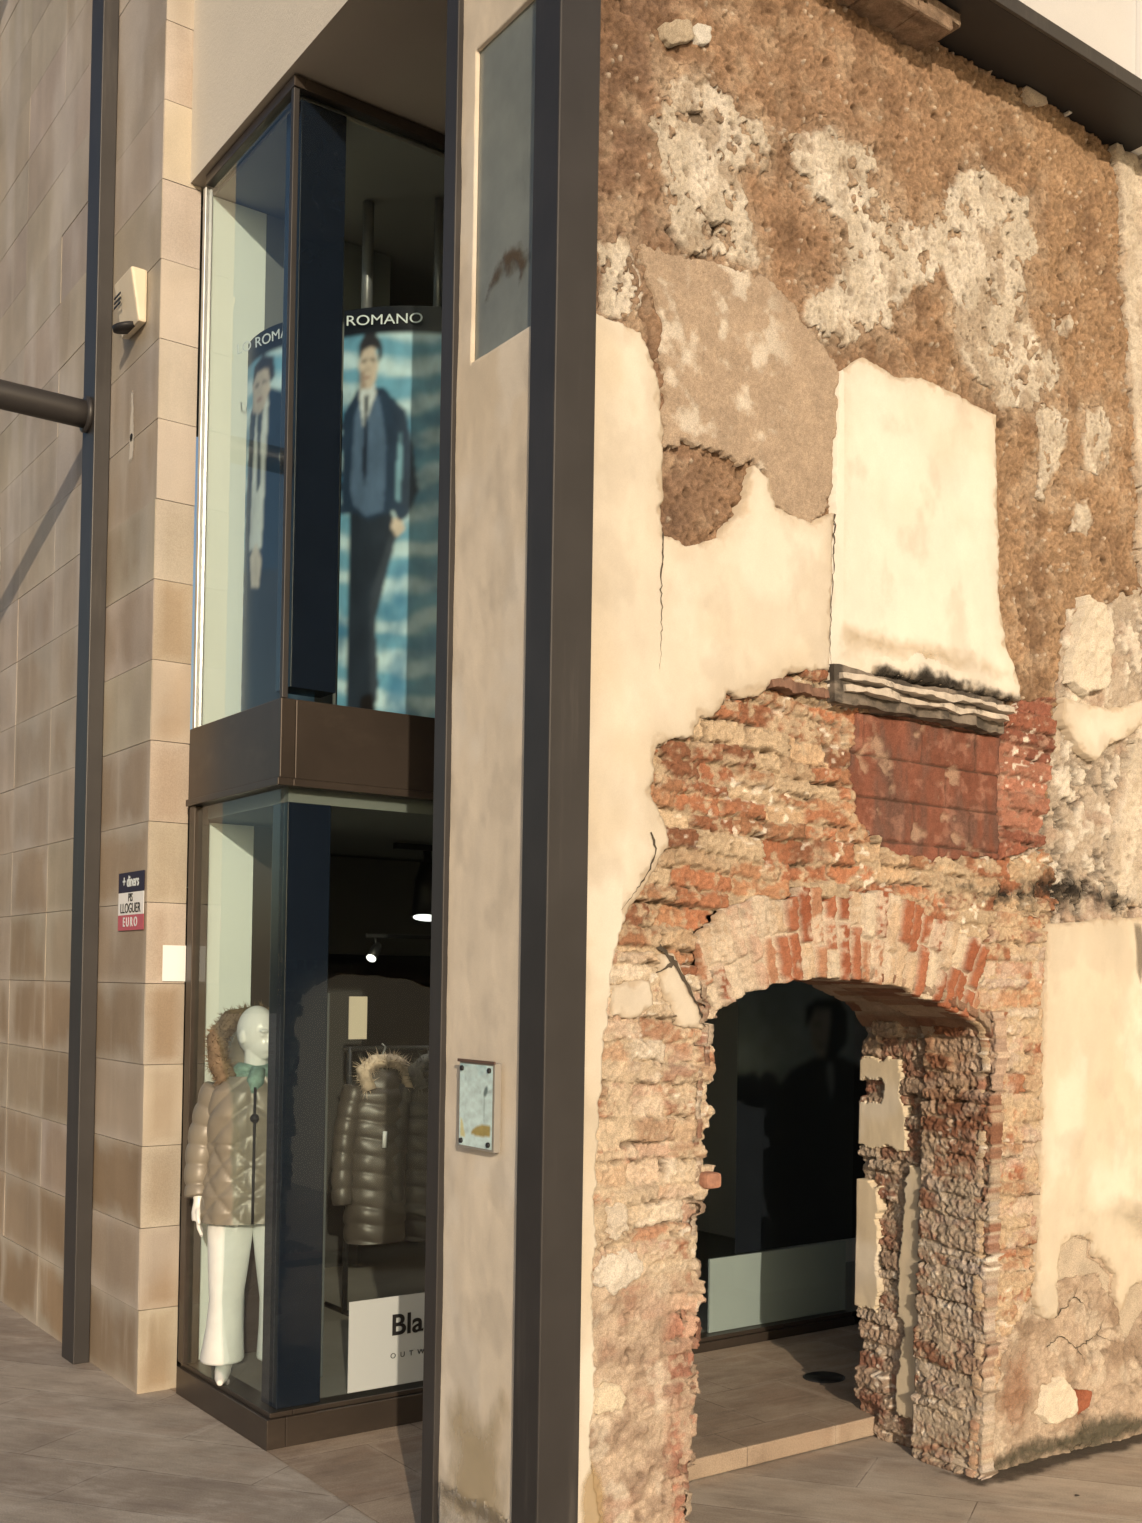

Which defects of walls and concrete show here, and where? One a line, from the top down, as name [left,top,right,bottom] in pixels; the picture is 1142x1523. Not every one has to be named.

spalling [596,0,1142,765]
spalling [616,669,1059,976]
spalling [993,1236,1142,1471]